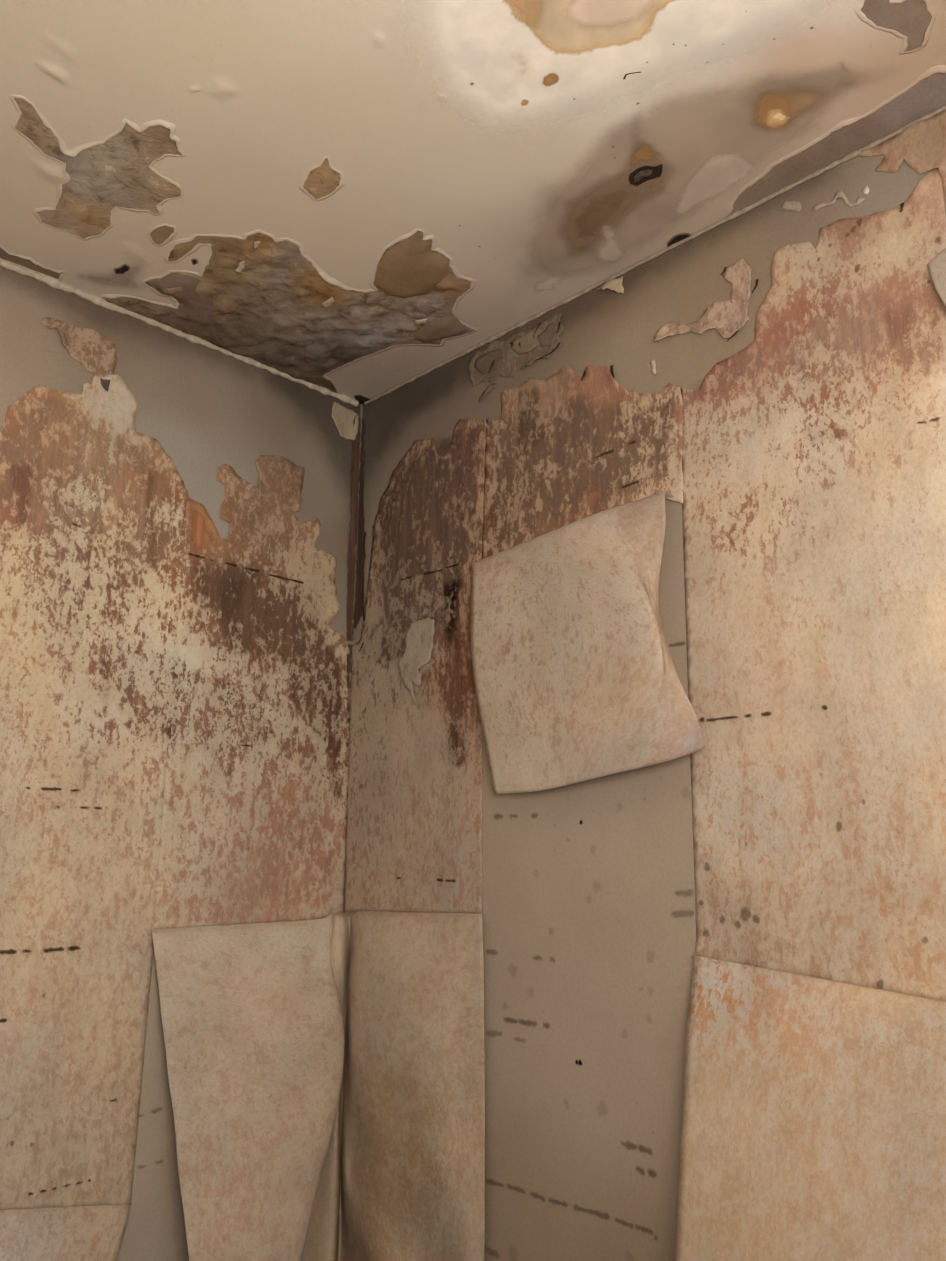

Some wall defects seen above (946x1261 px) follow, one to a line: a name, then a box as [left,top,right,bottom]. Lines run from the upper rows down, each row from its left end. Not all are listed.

leakage [415,0,824,123]
peeling [855,0,937,54]
leakage [536,76,837,290]
spalling [10,94,479,440]
flaking render [596,276,624,294]
leakage [282,215,741,500]
leakage [189,553,303,584]